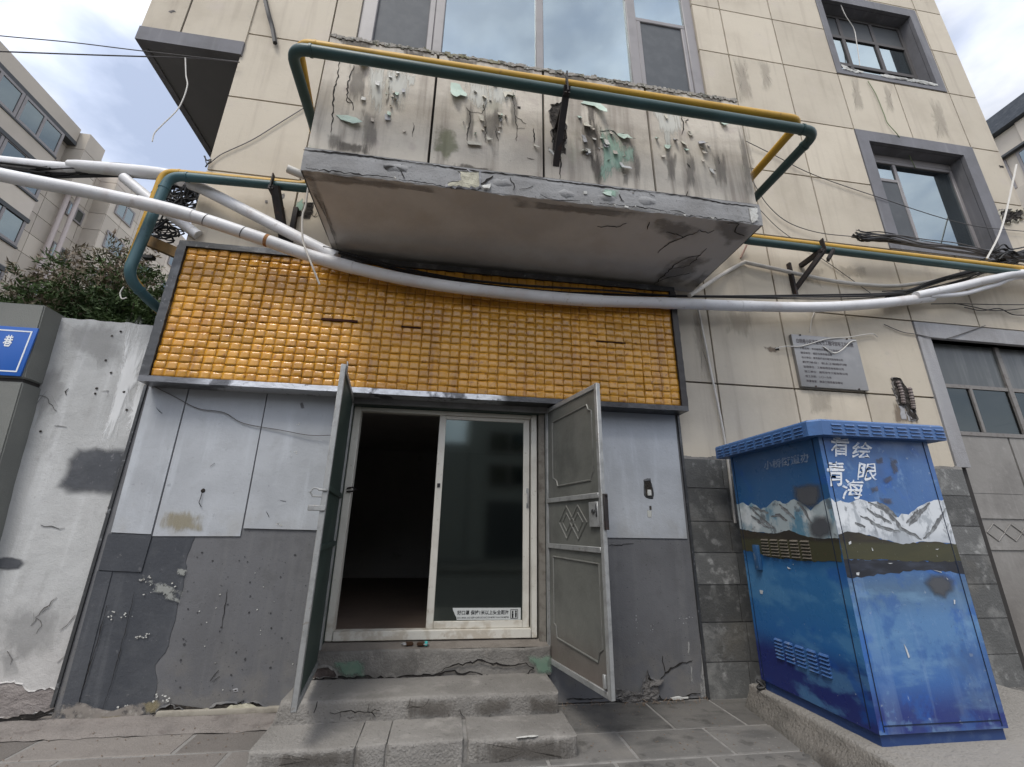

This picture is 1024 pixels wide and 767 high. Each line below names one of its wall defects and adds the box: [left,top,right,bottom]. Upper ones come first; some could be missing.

peeling [336,68,415,124]
peeling [450,82,515,146]
crack [303,62,753,283]
peeling [578,101,636,209]
peeling [655,112,715,174]
peeling [0,651,268,719]
crack [314,659,534,716]
crack [659,656,701,701]